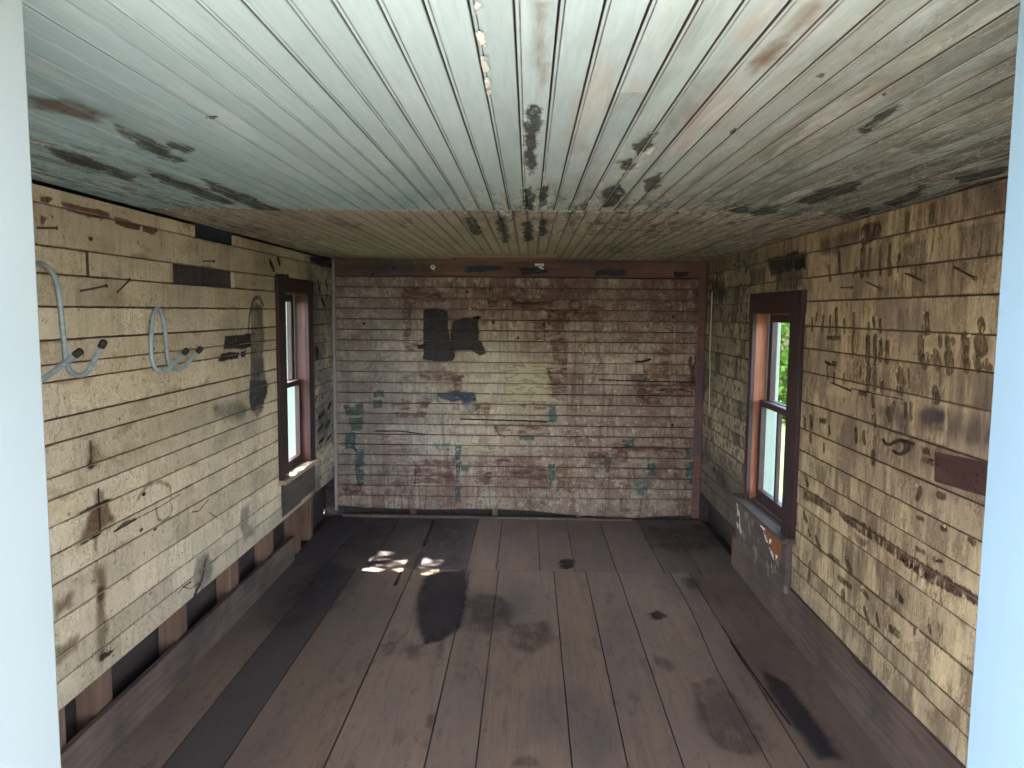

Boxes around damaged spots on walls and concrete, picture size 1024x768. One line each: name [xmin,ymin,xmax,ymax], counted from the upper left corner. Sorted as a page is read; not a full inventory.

peeling [475,31,492,95]
leakage [32,98,96,122]
leakage [113,124,195,163]
leakage [44,147,283,211]
leakage [494,104,549,244]
leakage [617,132,659,171]
leakage [643,172,662,193]
leakage [856,105,900,135]
leakage [821,184,929,282]
peeling [760,525,781,572]
leakage [417,570,467,643]
leakage [765,674,837,759]